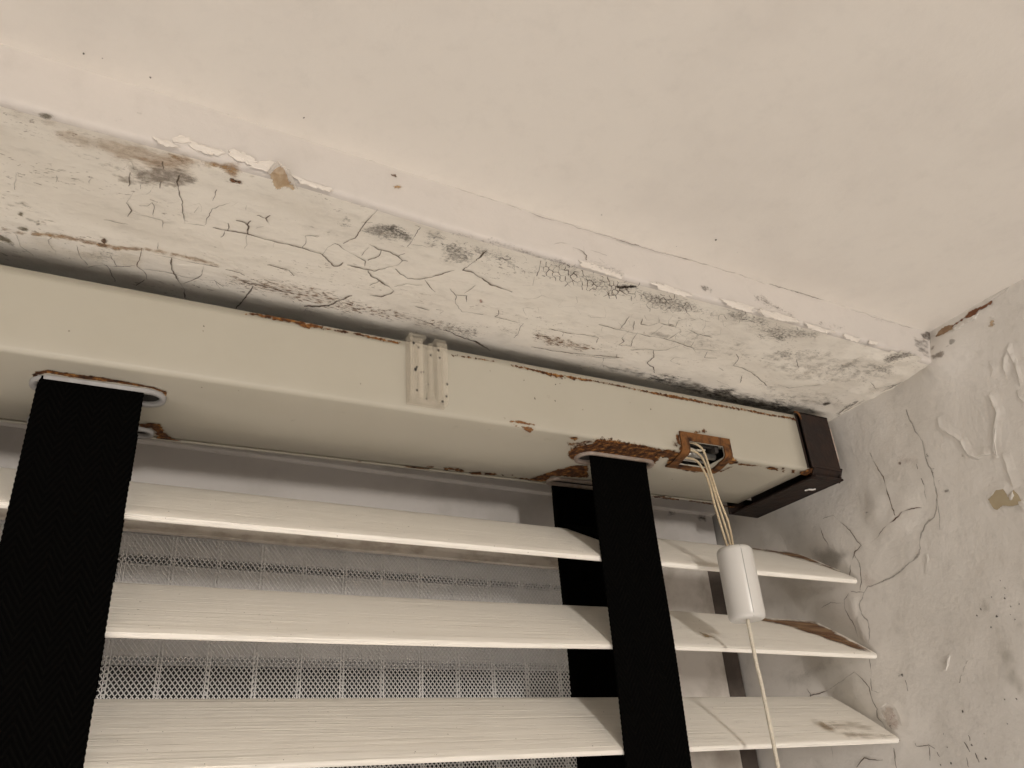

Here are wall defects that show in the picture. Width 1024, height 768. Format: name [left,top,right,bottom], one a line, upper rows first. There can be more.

peeling [153,135,333,192]
damp [367,225,411,241]
crack [77,162,816,388]
rust [245,313,400,344]
rust [32,370,167,396]
rust [511,364,796,421]
damp [677,382,789,411]
rust [139,423,179,441]
peeling [937,343,1024,511]
rust [405,434,682,481]
crack [808,456,940,722]
crack [857,740,940,767]